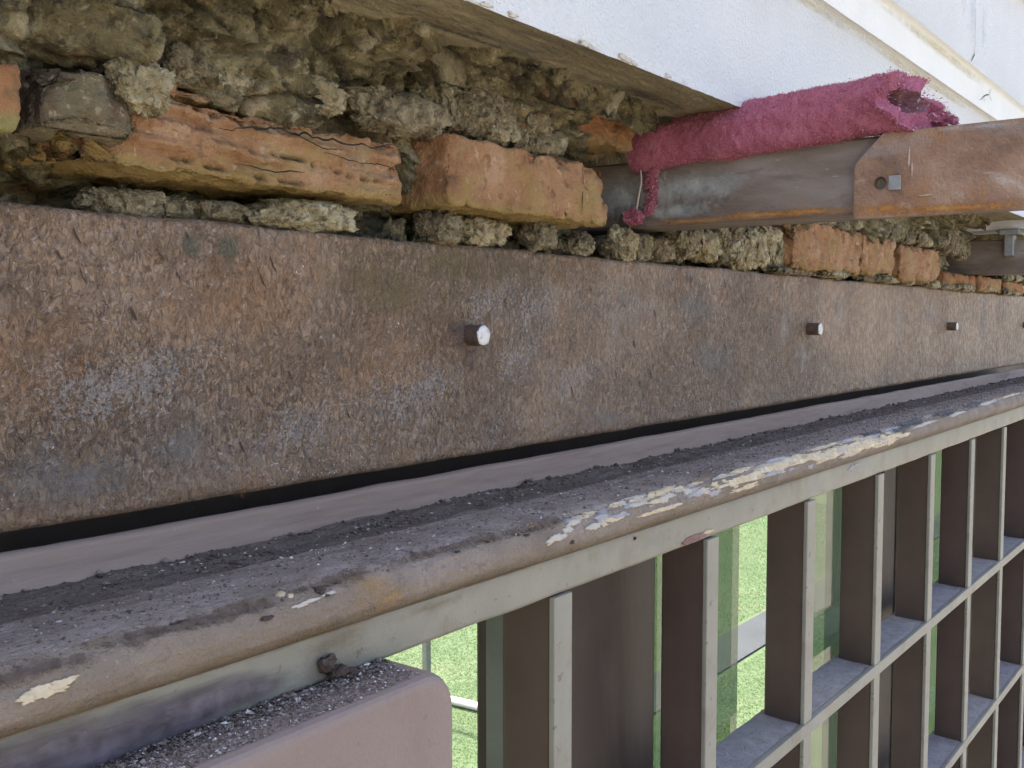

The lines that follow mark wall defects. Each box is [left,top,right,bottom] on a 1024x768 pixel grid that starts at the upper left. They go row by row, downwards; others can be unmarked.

crack [235,163,305,173]
crack [220,126,399,170]
corrosion [664,209,839,223]
corrosion [860,202,1010,216]
peeling [391,392,1020,563]
peeling [101,566,369,648]
peeling [0,653,93,706]
peeling [0,678,275,768]